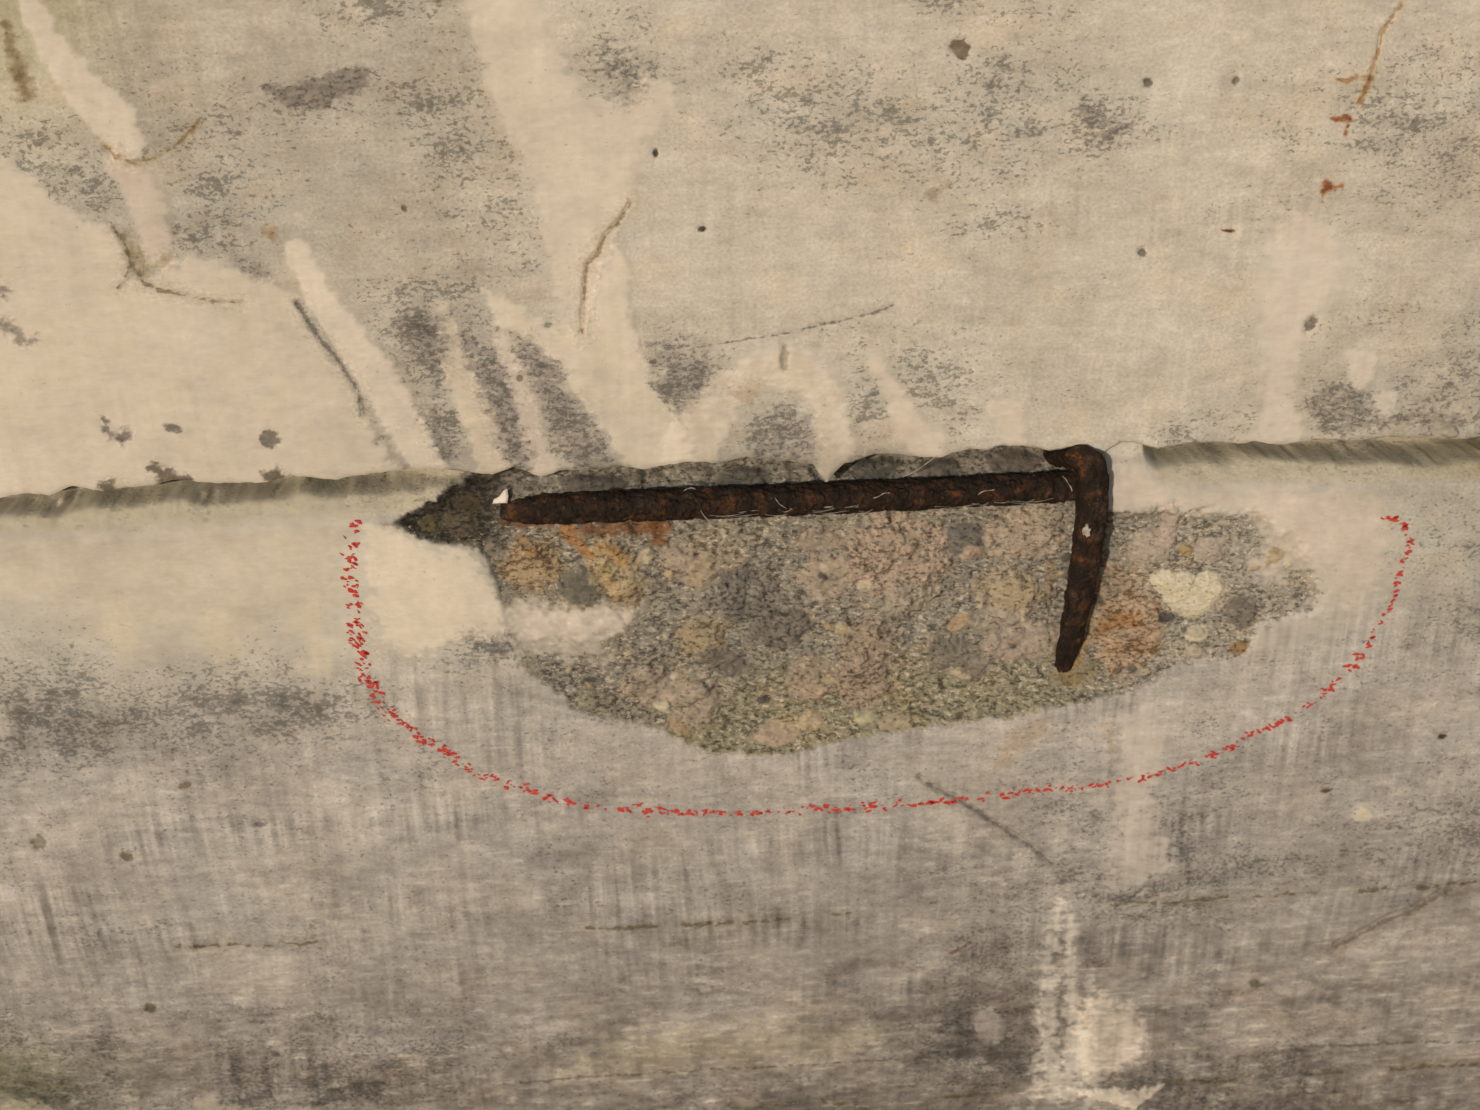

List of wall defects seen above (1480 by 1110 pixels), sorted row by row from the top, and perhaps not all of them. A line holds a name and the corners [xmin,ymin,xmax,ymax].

leakage [1052,79,1149,161]
rust [1326,111,1360,139]
rust [1317,174,1347,205]
leakage [0,0,960,498]
leakage [1239,206,1480,445]
leakage [983,394,1031,447]
leakage [452,590,650,675]
rust [493,514,677,608]
spalling [394,445,1316,758]
rust [1052,510,1150,690]
leakage [978,703,1069,780]
leakage [528,889,1157,1110]